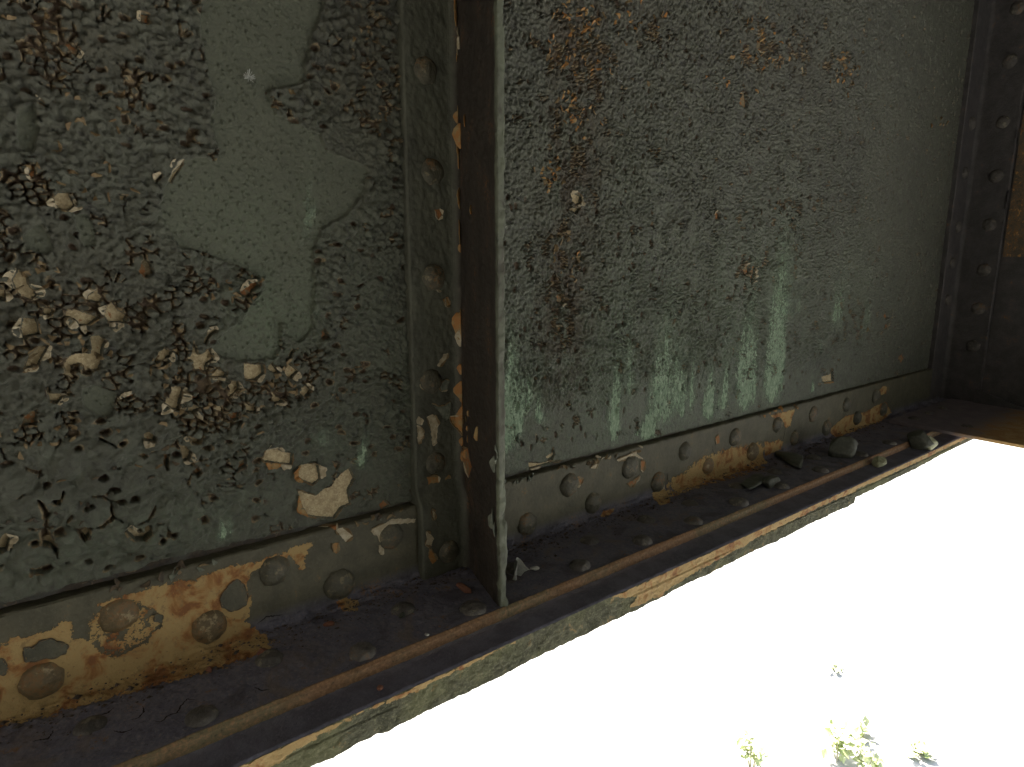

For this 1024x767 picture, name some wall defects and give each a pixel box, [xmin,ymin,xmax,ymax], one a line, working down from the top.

peeling [452,105,465,168]
peeling [24,162,110,213]
peeling [152,159,184,182]
peeling [203,274,265,303]
peeling [0,258,126,460]
peeling [140,326,314,466]
peeling [416,297,478,478]
corrosion [771,409,795,427]
corrosion [831,386,891,437]
peeling [179,436,204,473]
corrosion [613,437,967,608]
corrosion [0,542,314,728]